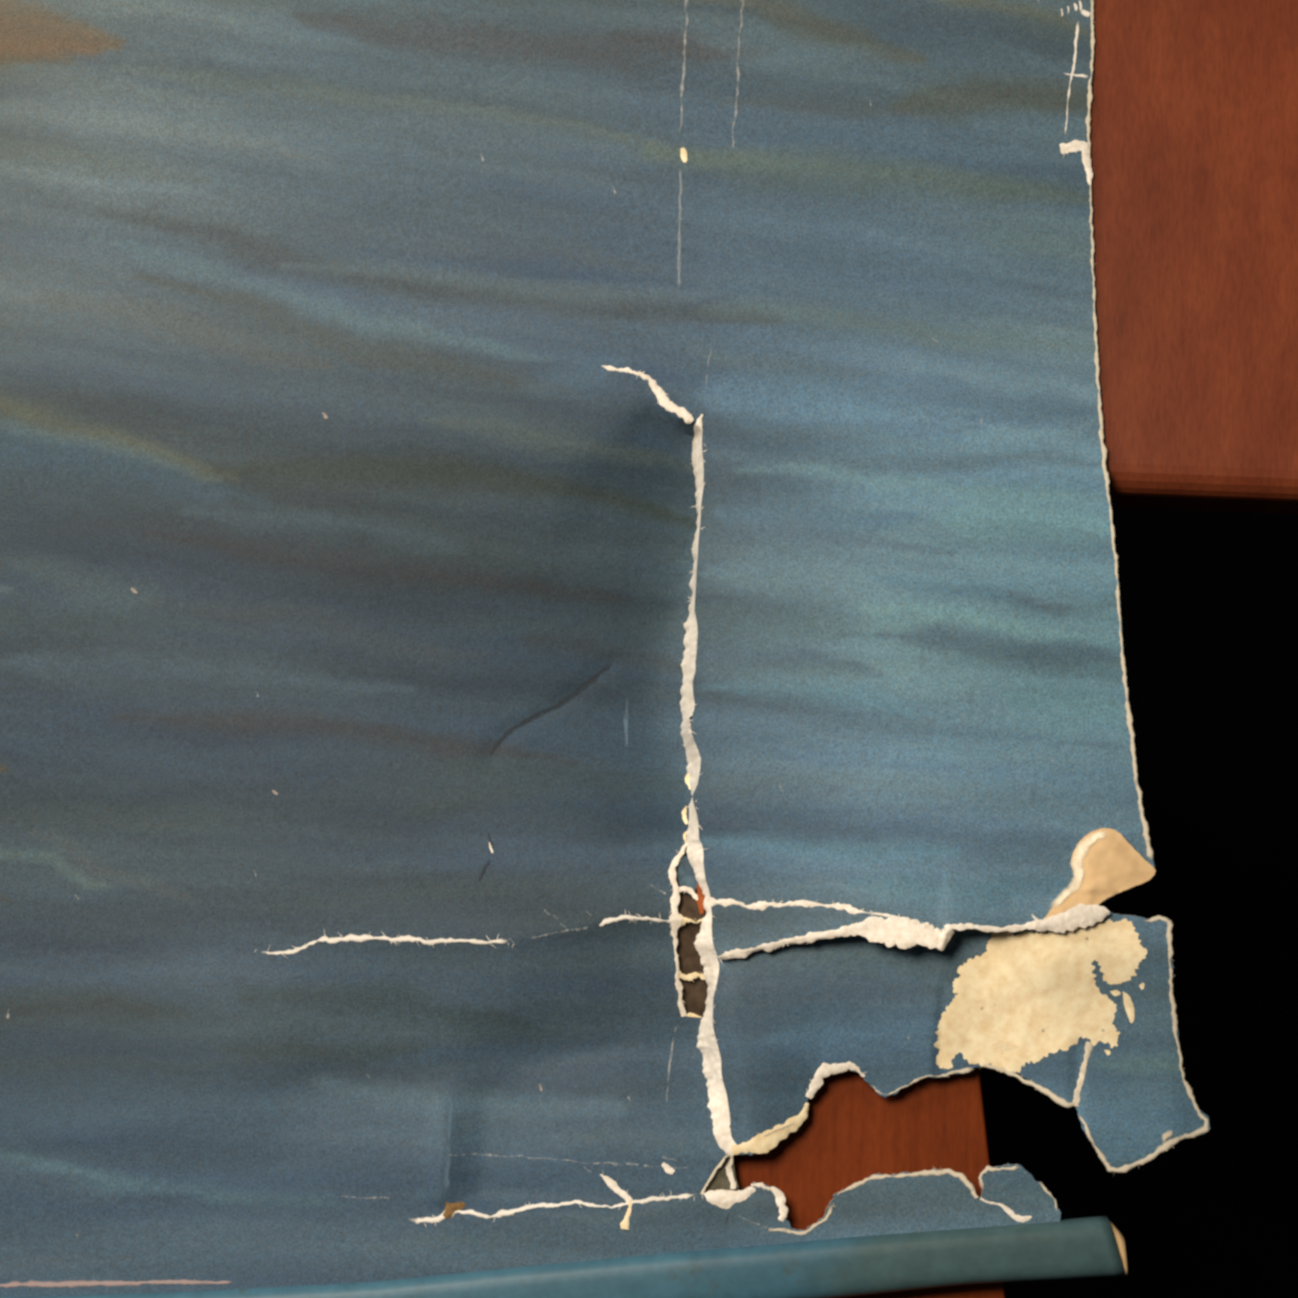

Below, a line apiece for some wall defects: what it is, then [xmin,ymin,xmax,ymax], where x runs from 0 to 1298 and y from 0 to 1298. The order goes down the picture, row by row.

peeling [934,828,1156,1107]
peeling [704,1186,756,1209]